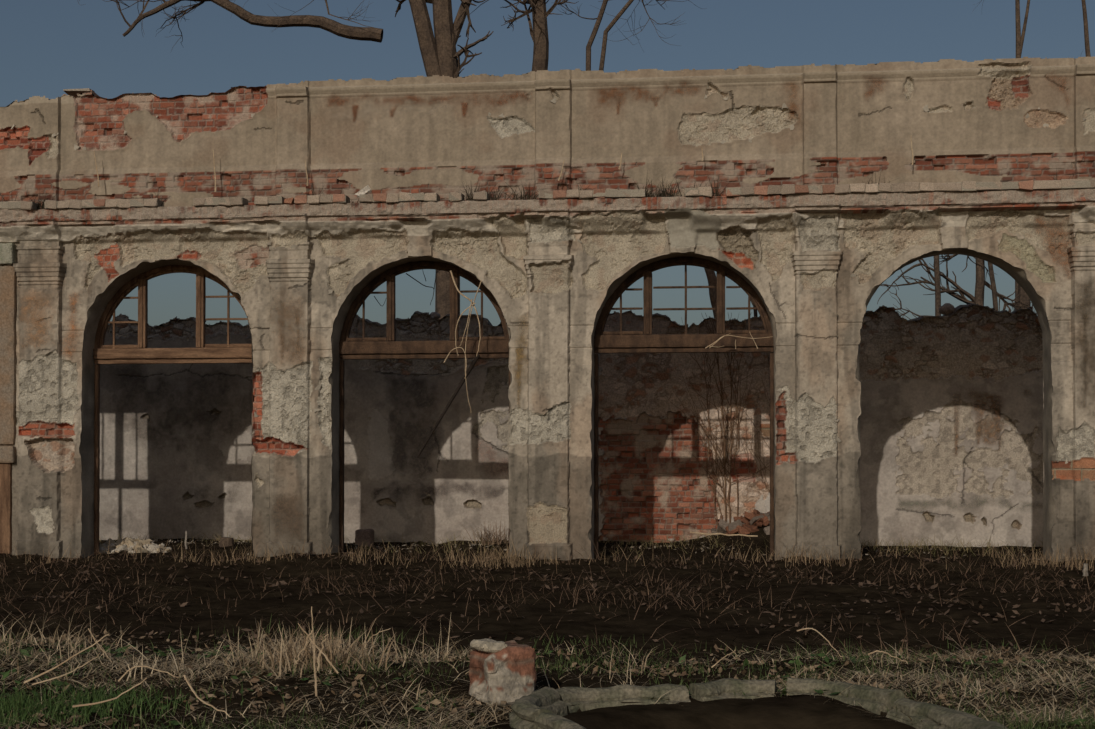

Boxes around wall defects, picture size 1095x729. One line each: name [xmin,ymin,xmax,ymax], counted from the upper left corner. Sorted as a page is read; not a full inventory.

flaking render [0,124,61,164]
flaking render [74,86,268,150]
spalling [487,112,536,138]
spalling [677,79,799,146]
spalling [922,60,1069,128]
spalling [965,207,1095,282]
spalling [15,350,81,472]
spalling [219,356,333,464]
spalling [472,364,572,450]
flaking render [598,410,723,543]
spalling [775,385,841,464]
spalling [895,394,1095,499]